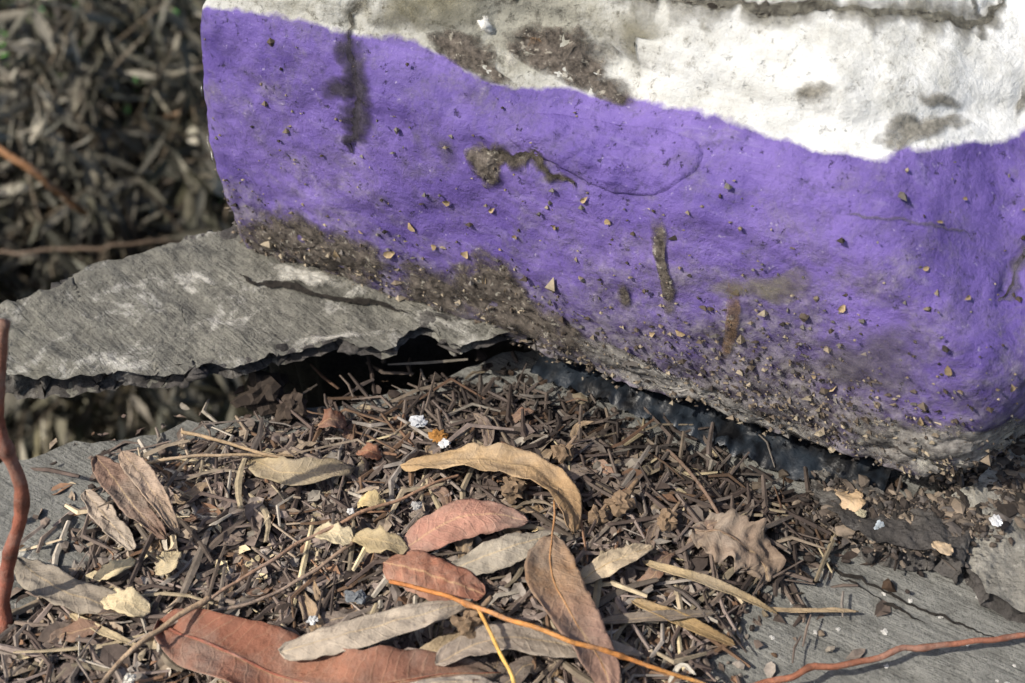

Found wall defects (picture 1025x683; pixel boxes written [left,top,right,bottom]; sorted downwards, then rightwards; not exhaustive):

crack [623,0,1006,40]
crack [328,0,370,153]
crack [240,274,408,313]
crack [997,247,1025,301]